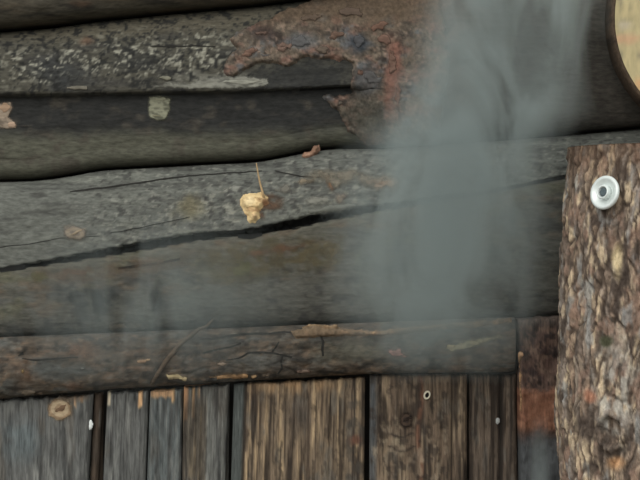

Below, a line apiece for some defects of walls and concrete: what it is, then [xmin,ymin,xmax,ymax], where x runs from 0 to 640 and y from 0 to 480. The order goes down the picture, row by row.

spalling [0,102,16,128]
spalling [149,96,170,120]
crack [70,170,320,192]
crack [0,175,565,272]
crack [200,331,292,374]